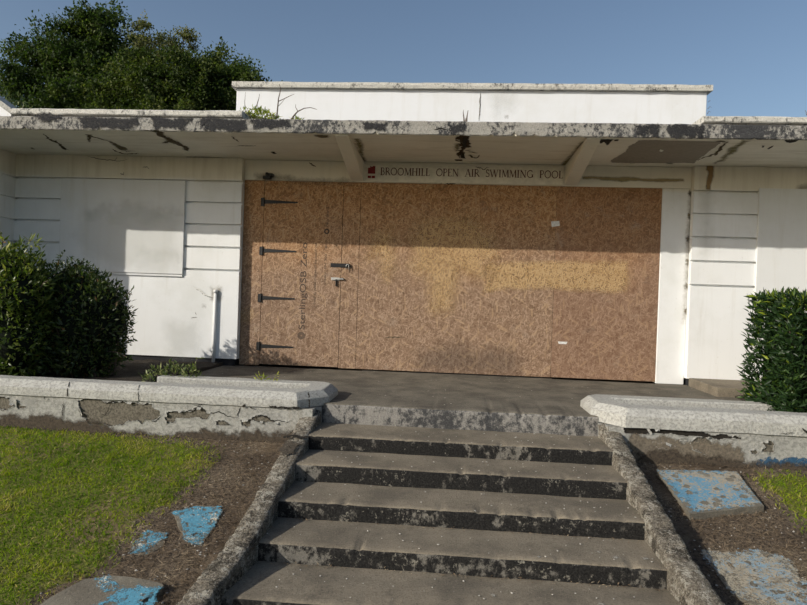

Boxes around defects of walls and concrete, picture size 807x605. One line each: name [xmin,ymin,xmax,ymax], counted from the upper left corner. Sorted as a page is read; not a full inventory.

peeling [611,140,720,164]
flaking render [0,397,26,411]
flaking render [78,398,285,427]
flaking render [628,429,774,462]